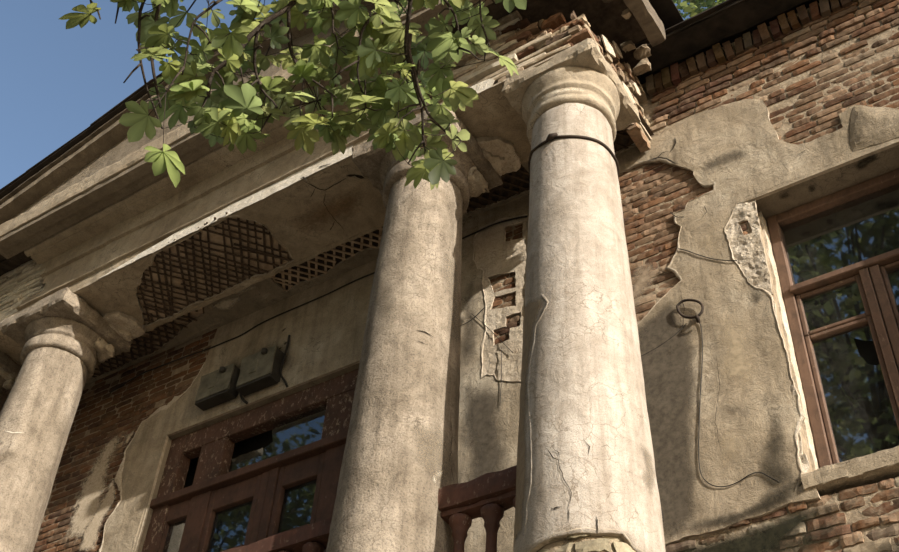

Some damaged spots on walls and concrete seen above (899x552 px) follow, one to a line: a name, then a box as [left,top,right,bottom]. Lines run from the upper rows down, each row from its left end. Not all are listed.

peeling [470,78,495,94]
spalling [466,136,530,218]
flaking render [488,0,899,325]
spalling [0,358,22,391]
spalling [33,145,383,552]
spalling [473,214,548,549]
leakage [638,304,796,531]
crack [547,449,572,523]
spalling [527,527,644,552]